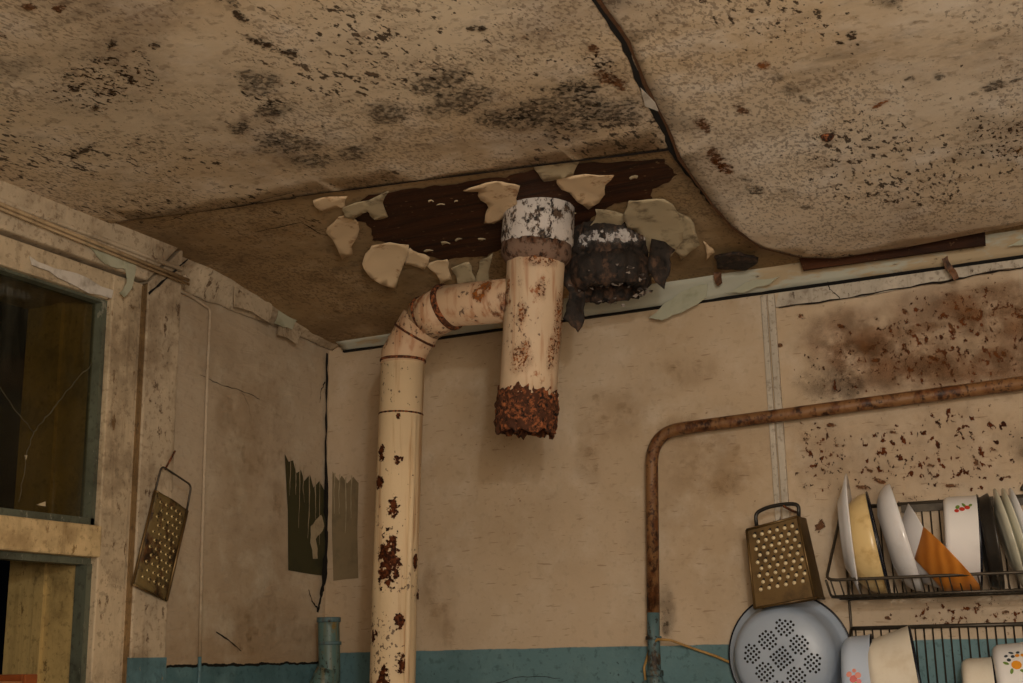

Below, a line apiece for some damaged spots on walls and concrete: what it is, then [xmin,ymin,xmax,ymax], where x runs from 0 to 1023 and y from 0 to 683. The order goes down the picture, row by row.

water stain [219,0,250,22]
water stain [238,70,291,117]
water stain [244,34,297,58]
water stain [231,120,375,168]
crack [125,0,721,222]
peeling [313,159,715,288]
peeling [725,276,780,294]
corrosion [832,271,1023,392]
crack [309,353,328,612]
peeling [285,455,359,581]
corrosion [795,404,1023,502]